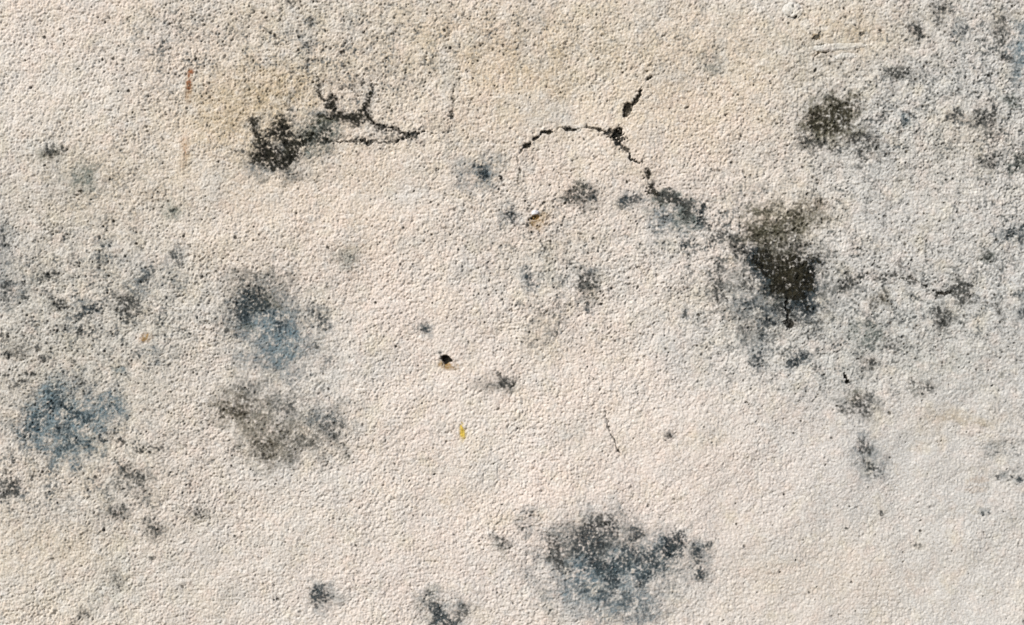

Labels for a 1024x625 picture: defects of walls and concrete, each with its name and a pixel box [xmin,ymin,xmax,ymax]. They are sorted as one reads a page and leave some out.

crack [338,76,460,146]
crack [517,65,657,182]
mould [802,93,878,169]
mould [619,168,826,366]
mould [224,274,326,369]
mould [17,381,124,468]
mould [221,388,338,461]
mould [546,514,712,623]